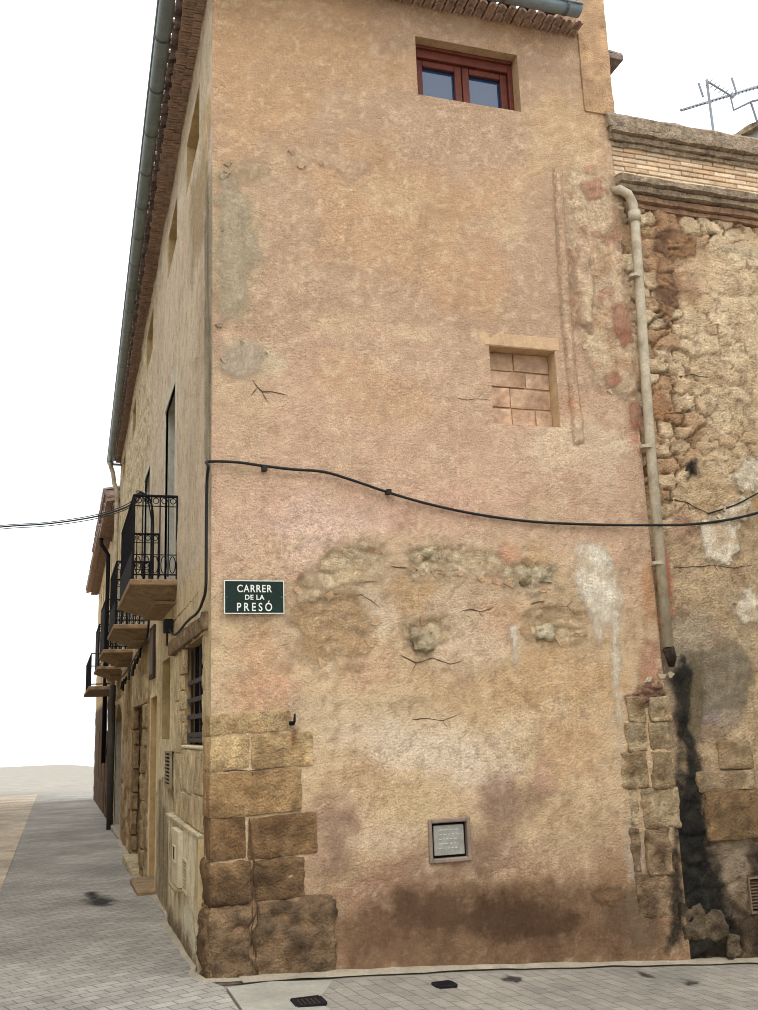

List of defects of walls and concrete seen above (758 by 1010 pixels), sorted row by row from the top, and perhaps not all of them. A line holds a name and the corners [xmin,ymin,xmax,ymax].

spalling [654,227,697,326]
crack [251,381,285,402]
spalling [686,459,700,479]
spalling [287,540,384,671]
spalling [403,612,451,661]
crack [401,655,463,671]
spalling [406,542,587,646]
damp [510,625,519,660]
damp [573,543,623,724]
damp [666,655,758,959]
damp [343,882,657,970]